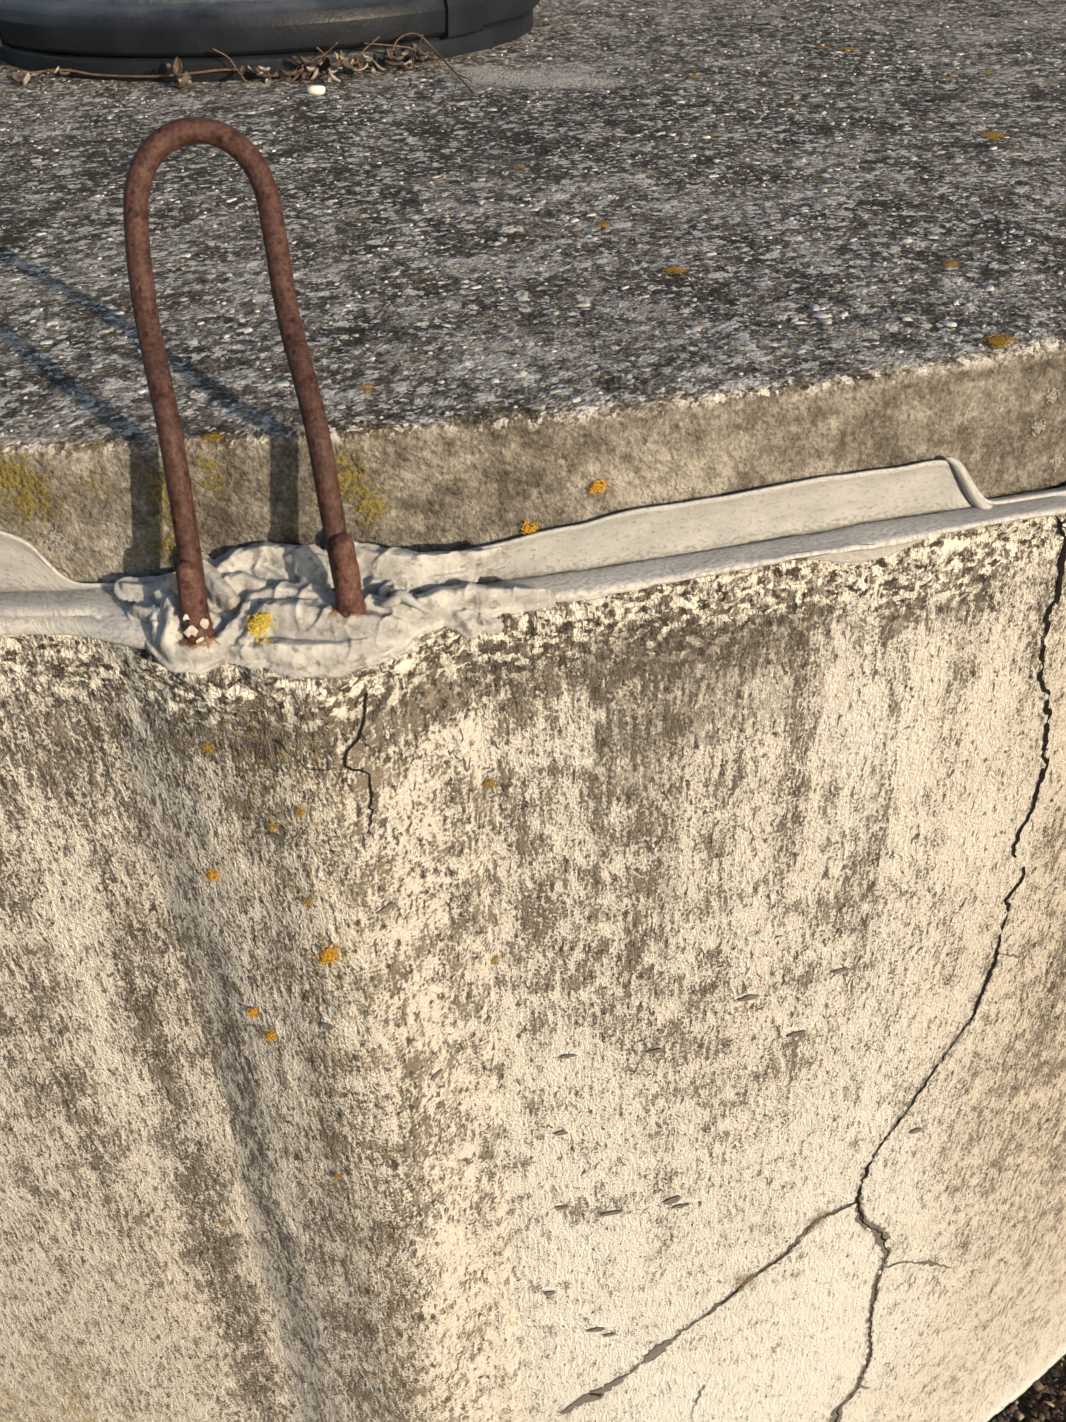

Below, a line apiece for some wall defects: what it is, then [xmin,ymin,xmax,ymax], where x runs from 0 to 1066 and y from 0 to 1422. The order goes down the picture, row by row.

corrosion [179,632,220,649]
crack [275,693,374,847]
crack [557,514,1066,1422]